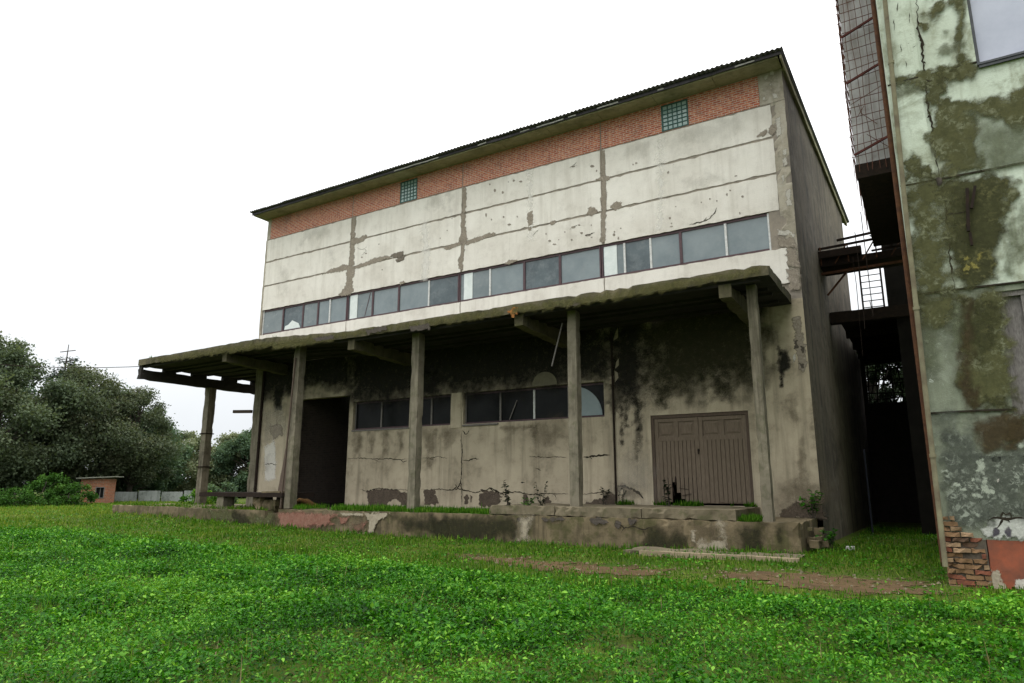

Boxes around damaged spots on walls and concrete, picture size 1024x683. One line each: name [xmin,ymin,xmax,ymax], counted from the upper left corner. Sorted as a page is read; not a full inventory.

crack [893,0,939,174]
water stain [263,307,776,452]
crack [348,431,608,505]
peeling [941,456,1001,497]
peeling [278,511,390,533]
flaking render [943,512,1024,590]